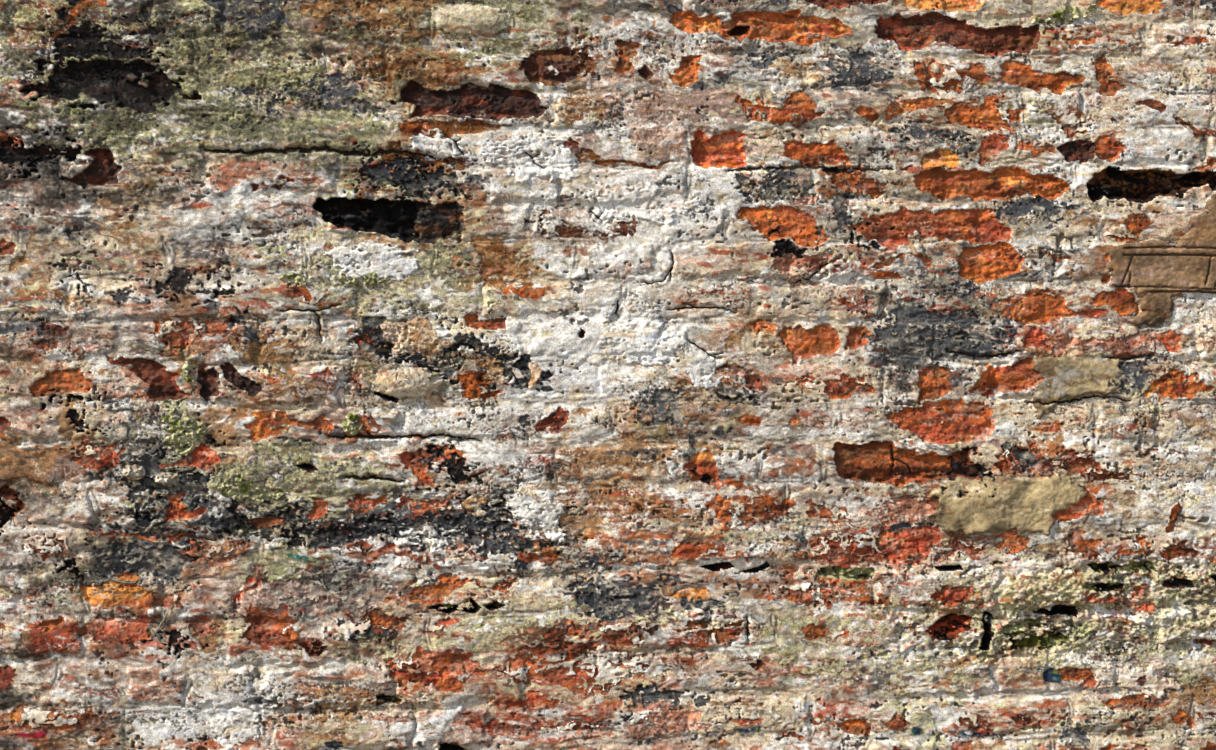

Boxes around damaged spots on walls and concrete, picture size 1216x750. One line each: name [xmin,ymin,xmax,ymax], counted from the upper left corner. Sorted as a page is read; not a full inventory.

damp [222,70,397,130]
spalling [390,45,600,121]
spalling [614,40,653,80]
spalling [312,197,464,244]
damp [856,274,1017,376]
flaking render [667,0,1216,650]
peeling [36,571,216,645]
peeling [86,491,669,740]
peeling [2,701,104,736]
flaking render [776,714,909,741]
peeling [936,710,994,750]
flaking render [1059,667,1214,729]